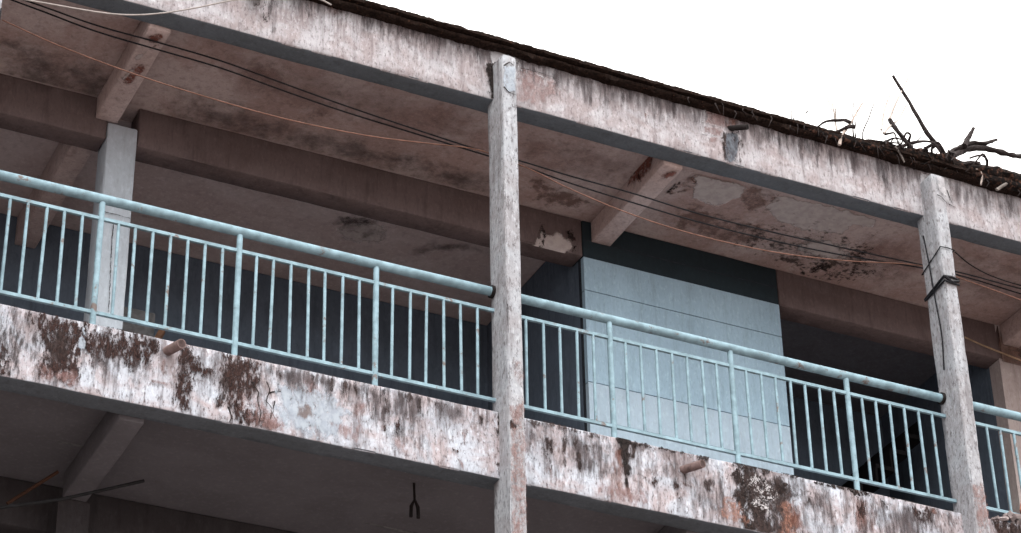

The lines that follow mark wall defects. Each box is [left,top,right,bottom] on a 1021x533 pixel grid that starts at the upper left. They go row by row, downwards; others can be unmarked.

leakage [455,42,496,99]
leakage [721,118,832,165]
peeling [628,157,653,185]
peeling [663,171,875,234]
peeling [535,222,577,253]
corrosion [781,501,800,533]